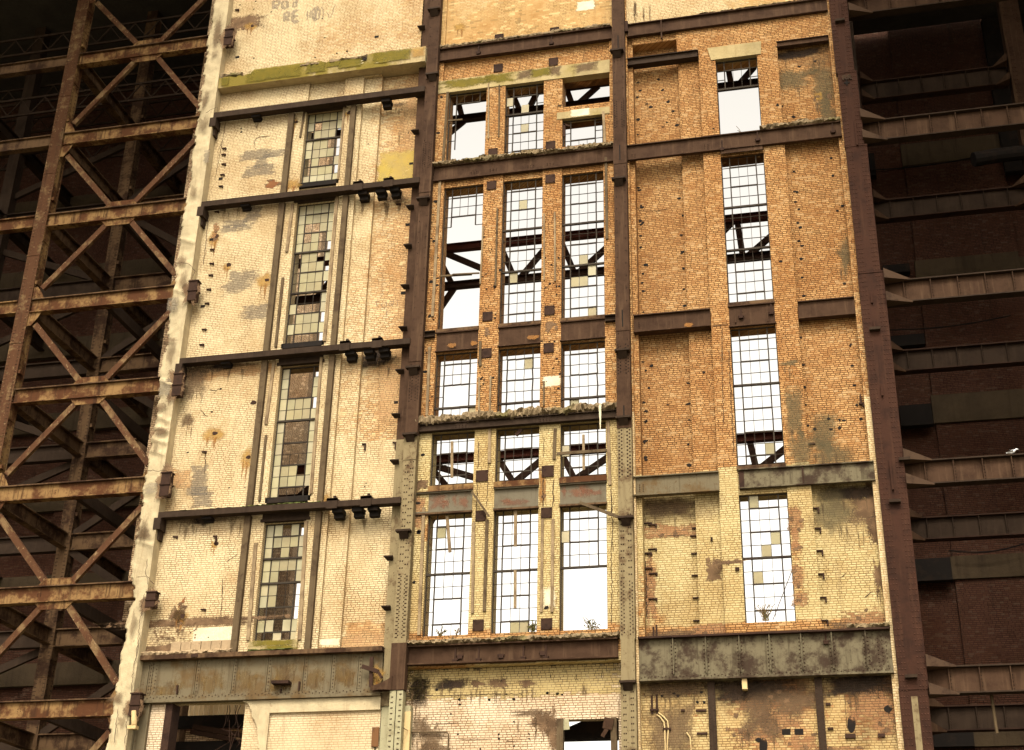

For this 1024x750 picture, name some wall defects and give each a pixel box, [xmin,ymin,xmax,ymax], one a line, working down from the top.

water stain [779,66,836,119]
rust [203,429,223,448]
water stain [786,393,849,465]
spalling [644,523,696,628]
spalling [139,587,290,652]
water stain [470,679,537,689]
water stain [412,718,450,750]
water stain [513,707,557,750]
water stain [644,682,706,750]
water stain [740,690,825,739]